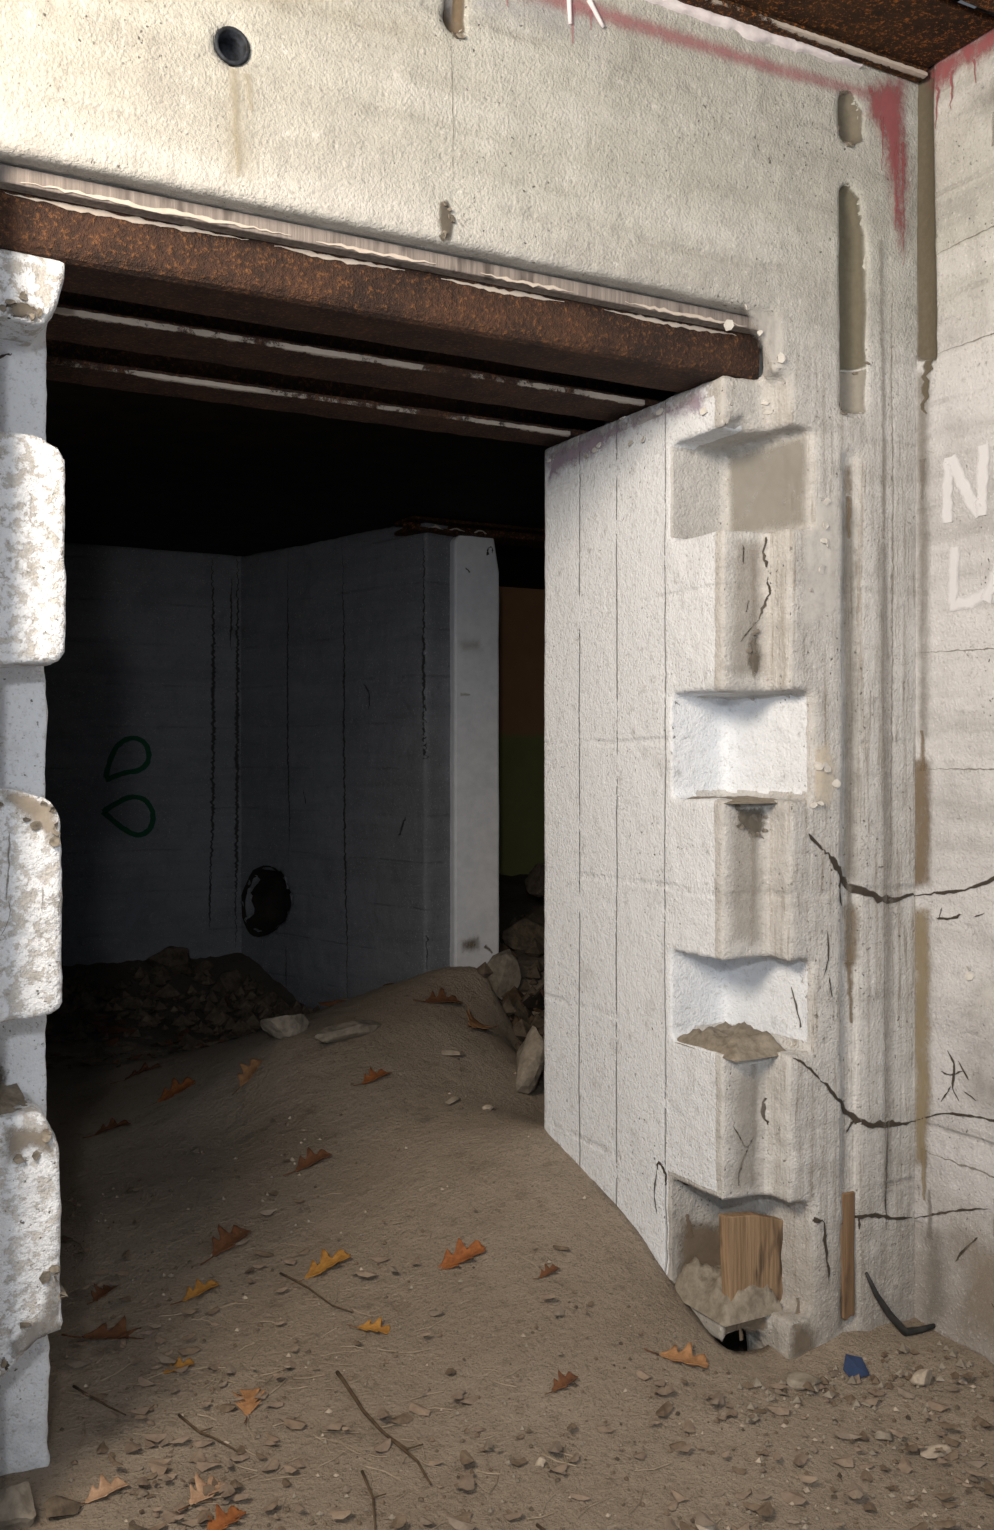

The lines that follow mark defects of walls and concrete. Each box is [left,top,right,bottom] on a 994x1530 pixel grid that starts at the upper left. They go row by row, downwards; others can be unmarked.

spalling [241,865,293,943]
crack [791,257,994,1280]